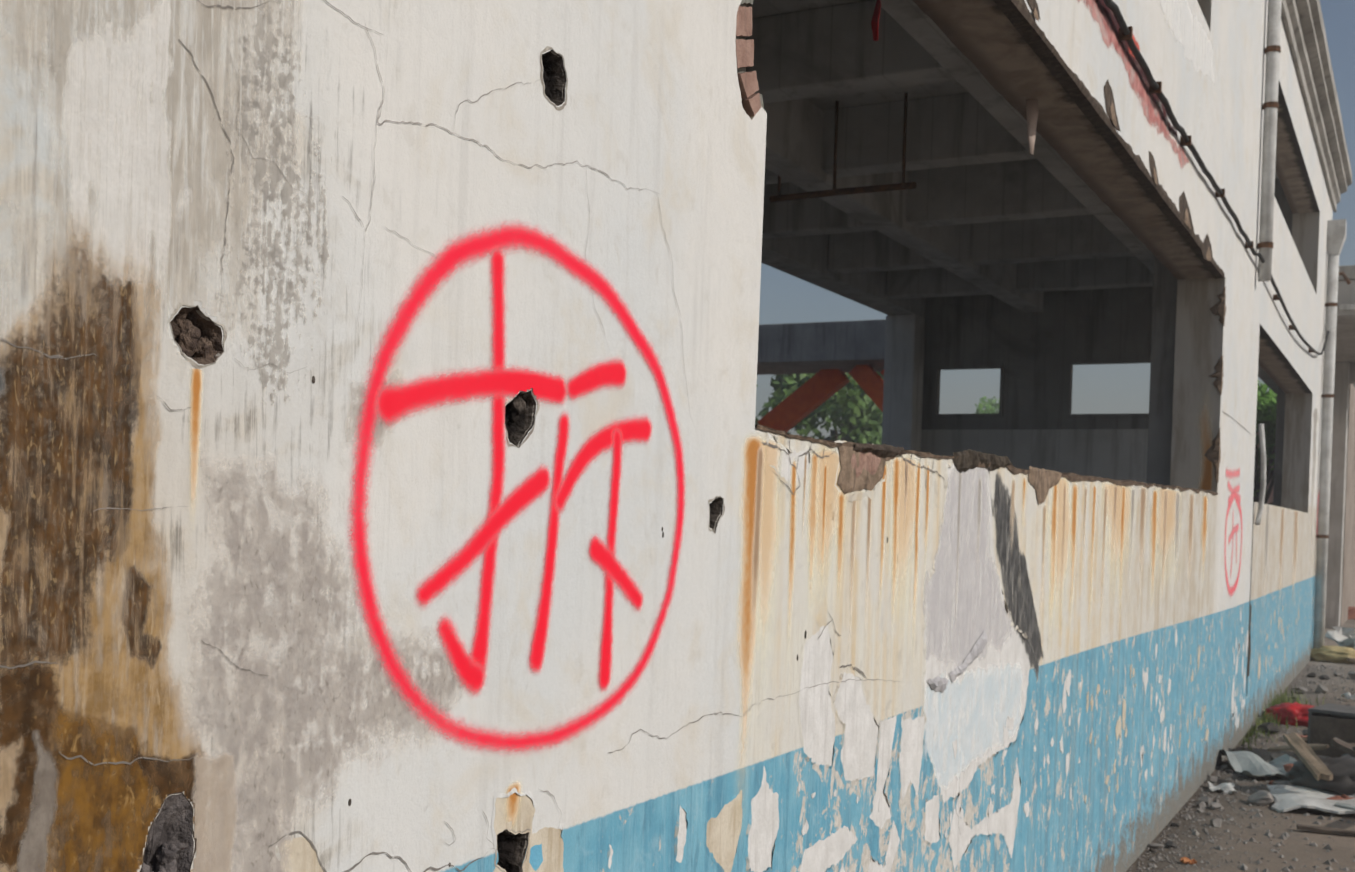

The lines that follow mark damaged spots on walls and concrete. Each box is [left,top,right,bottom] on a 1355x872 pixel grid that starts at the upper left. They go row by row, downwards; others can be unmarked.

crack [179,39,308,290]
crack [325,0,693,421]
spalling [993,0,1226,326]
rust [191,368,202,491]
damp [0,0,464,872]
crack [609,612,897,753]
rust [741,437,930,710]
peeling [755,425,1221,872]
rust [1043,415,1212,580]
crack [269,810,494,872]
peeling [491,787,566,872]
peeling [704,763,781,872]